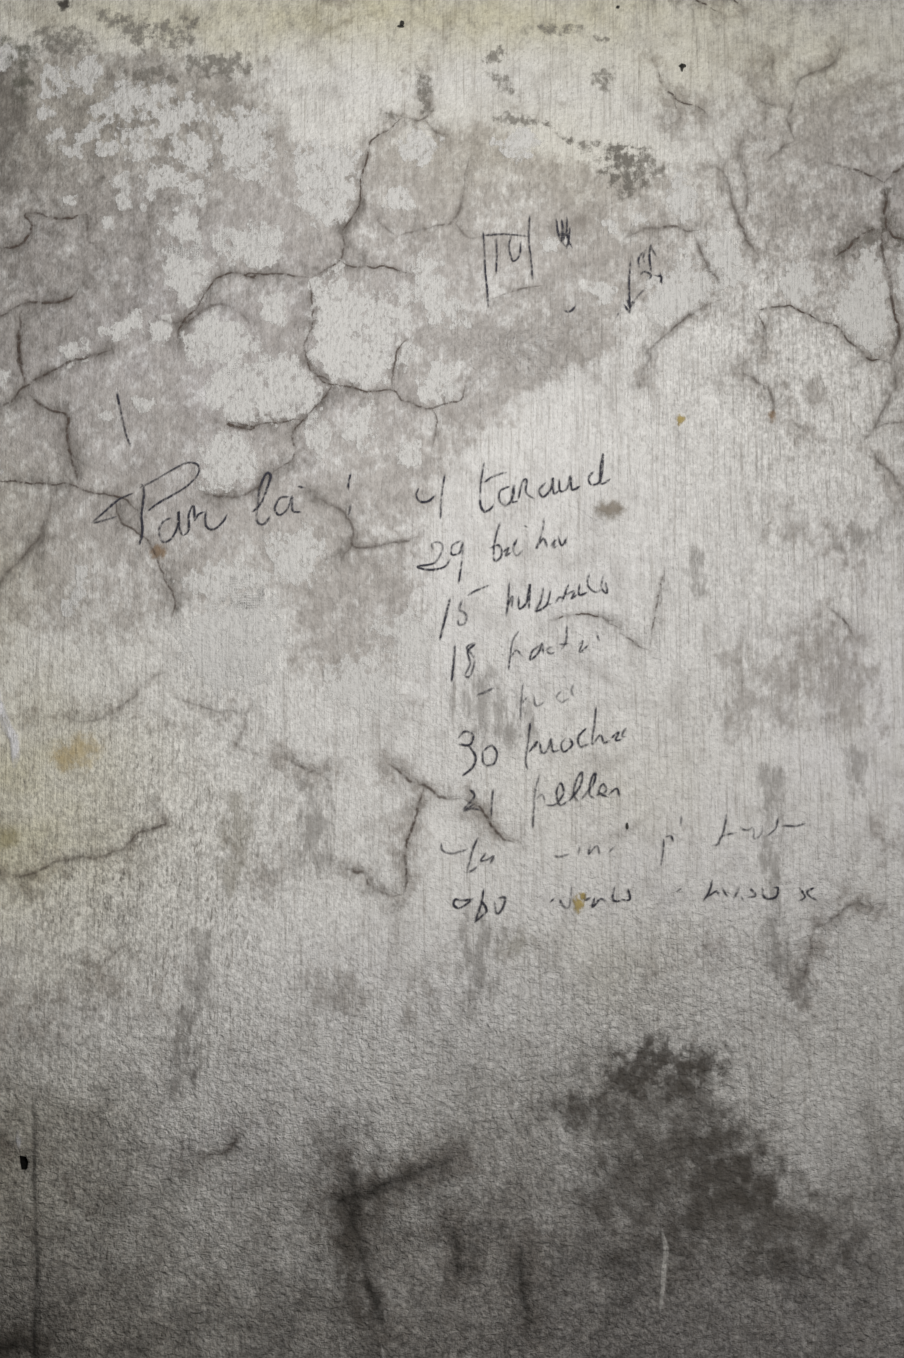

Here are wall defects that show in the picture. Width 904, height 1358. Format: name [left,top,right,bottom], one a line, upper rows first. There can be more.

crack [6,212,78,249]
peeling [37,54,472,497]
crack [332,125,398,271]
peeling [540,236,560,254]
peeling [587,281,618,306]
crack [760,168,902,361]
crack [178,272,464,464]
crack [2,295,176,603]
peeling [173,522,328,698]
peeling [323,604,438,719]
crack [395,768,446,885]
leakage [607,1041,722,1100]